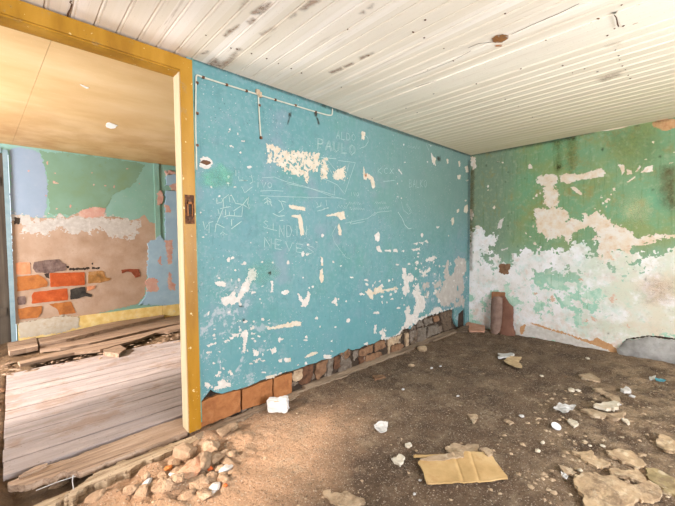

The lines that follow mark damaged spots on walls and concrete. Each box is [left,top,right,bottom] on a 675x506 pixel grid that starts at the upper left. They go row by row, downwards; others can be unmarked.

corrosion [492,34,508,47]
peeling [652,118,675,131]
peeling [265,143,348,183]
peeling [618,159,653,182]
peeling [158,240,174,265]
peeling [11,205,159,338]
peeling [201,168,675,428]